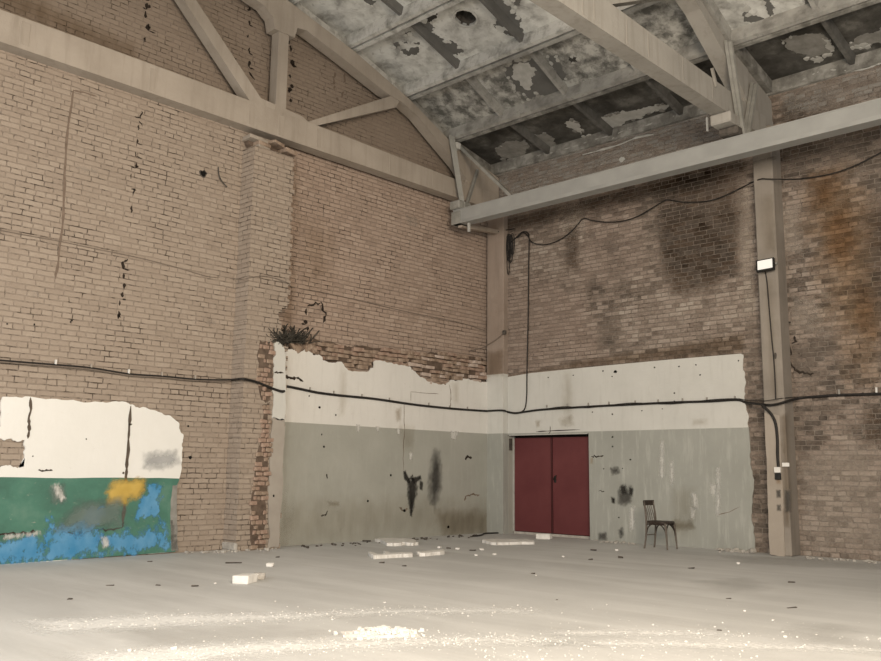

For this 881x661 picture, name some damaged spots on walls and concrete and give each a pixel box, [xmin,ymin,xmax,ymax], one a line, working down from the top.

crack [143,0,154,42]
peeling [420,13,465,58]
peeling [491,0,524,36]
crack [288,41,296,102]
peeling [502,55,577,101]
peeling [495,103,669,161]
crack [130,112,143,213]
crack [117,259,129,319]
crack [302,302,327,331]
spalling [286,336,487,385]
crack [122,406,132,481]
spalling [249,340,276,550]